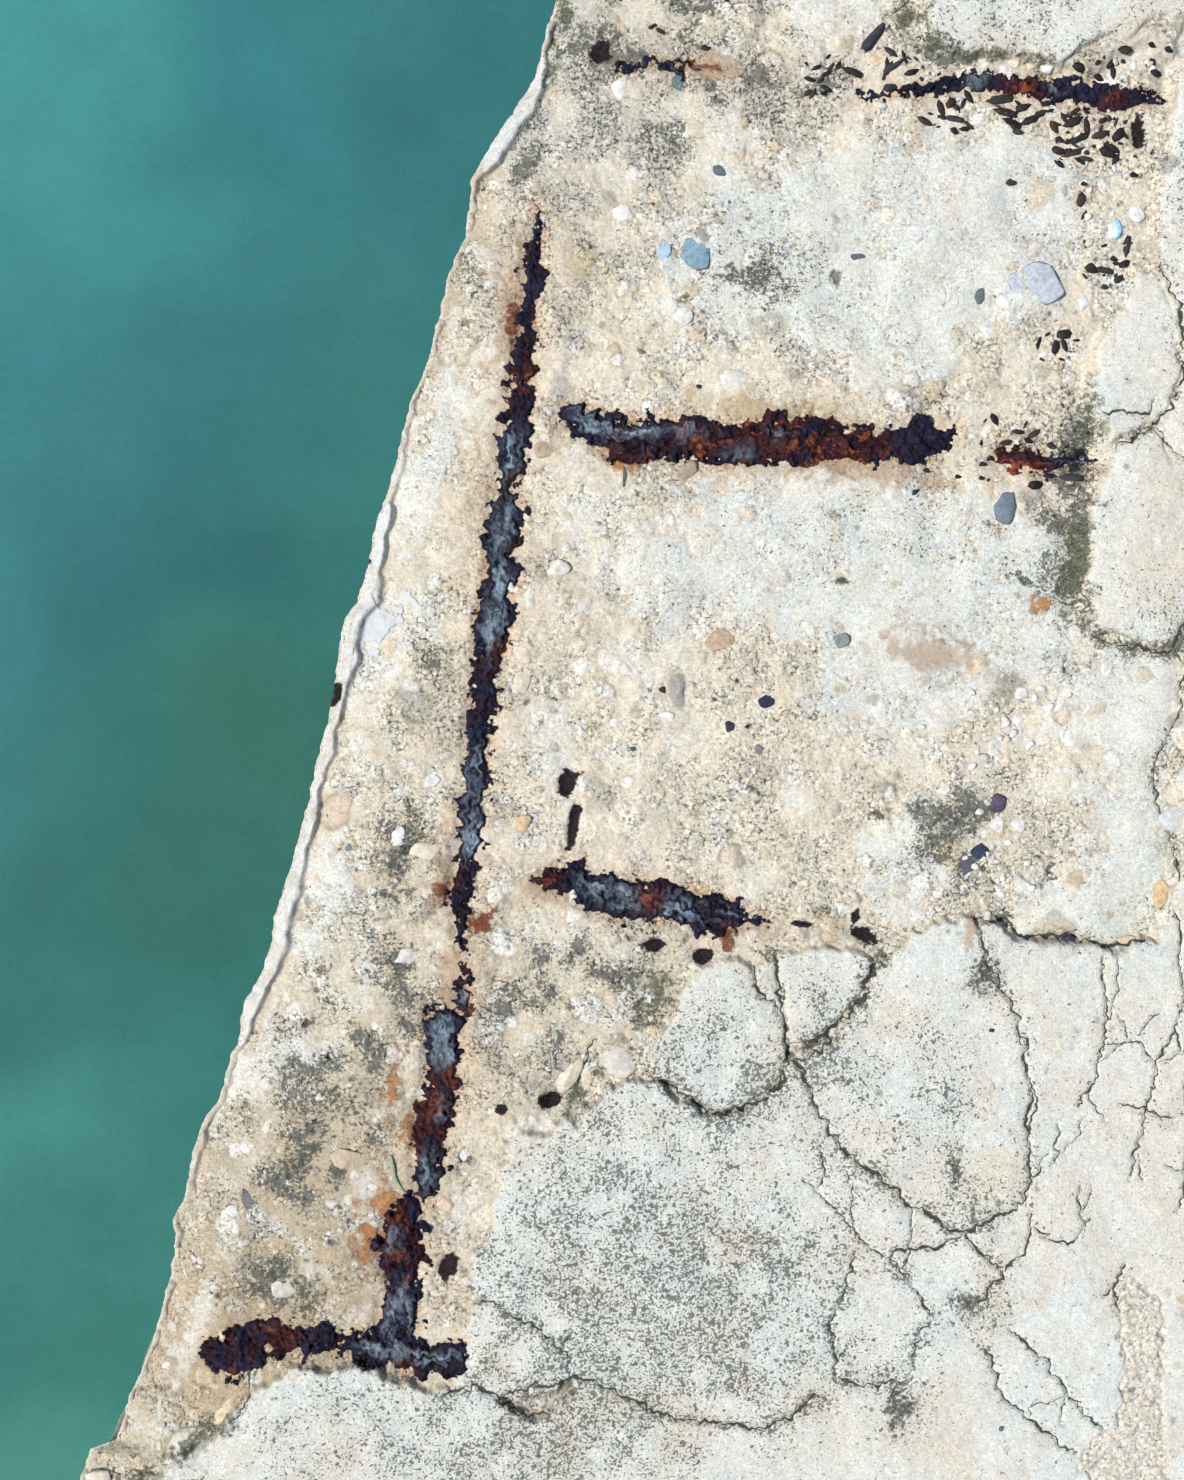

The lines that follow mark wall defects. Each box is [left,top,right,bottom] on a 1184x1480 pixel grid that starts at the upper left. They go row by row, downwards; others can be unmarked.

corrosion [855,68,1167,113]
crack [1101,271,1184,458]
corrosion [555,395,958,480]
corrosion [991,443,1098,476]
corrosion [198,210,549,1386]
corrosion [523,857,773,952]
spalling [691,949,713,965]
spalling [850,926,877,945]
crack [444,625,1184,1431]
spalling [537,1092,561,1110]
spalling [377,1360,454,1393]
crack [984,1329,1103,1453]